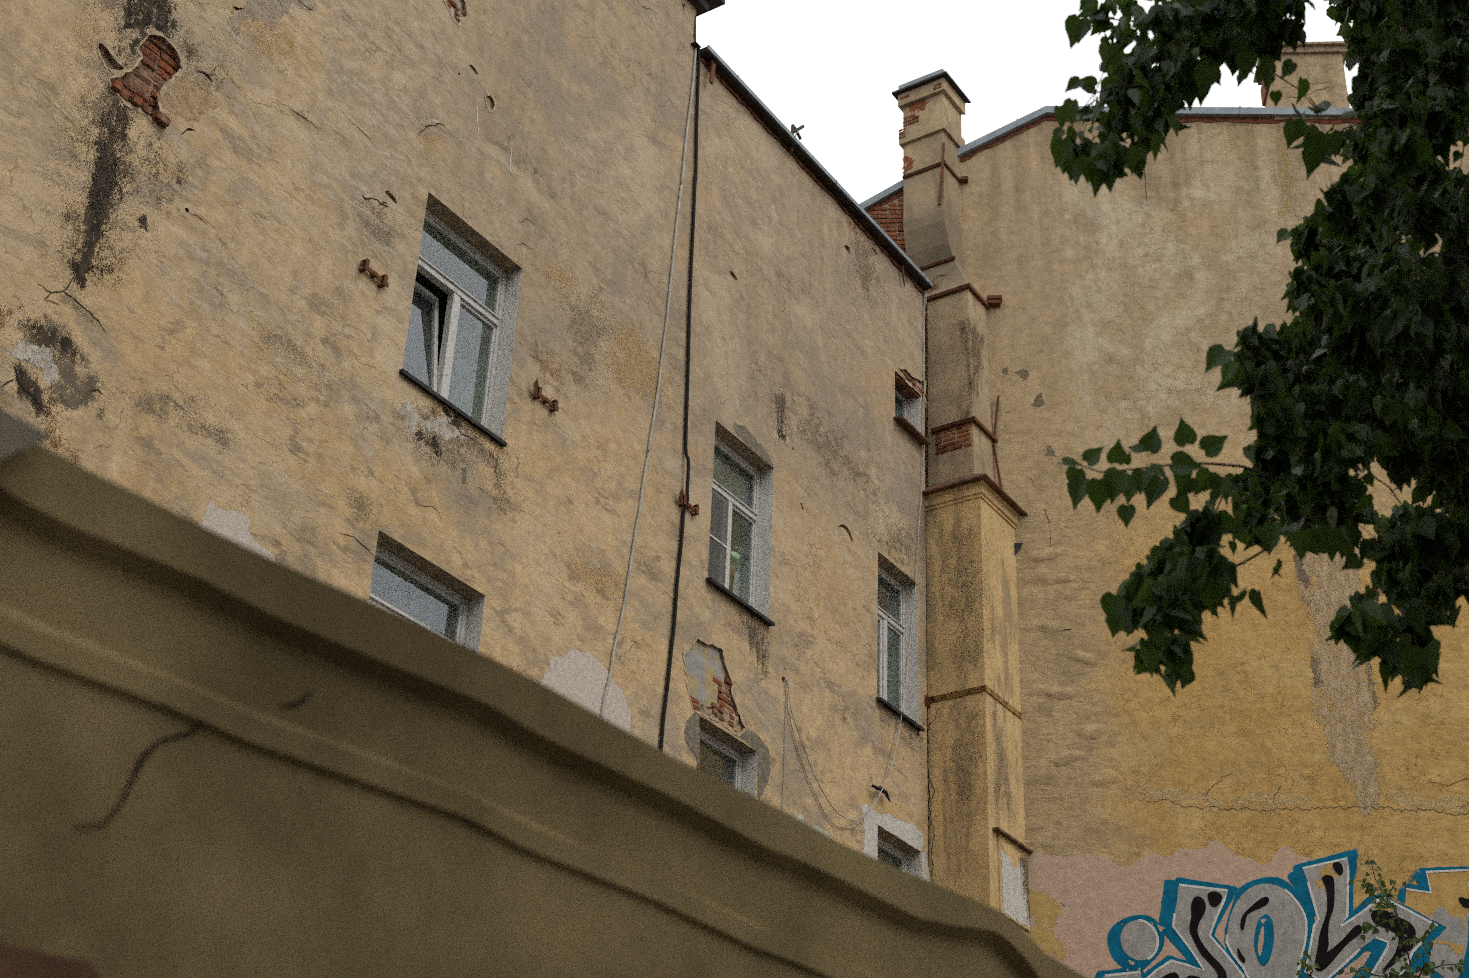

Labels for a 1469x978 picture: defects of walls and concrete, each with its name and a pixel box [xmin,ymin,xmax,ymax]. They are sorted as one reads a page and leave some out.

flaking render [97,30,219,135]
leakage [31,0,231,310]
crack [38,278,106,333]
flaking render [682,635,746,737]
leakage [931,517,1018,828]
crack [1131,772,1469,817]